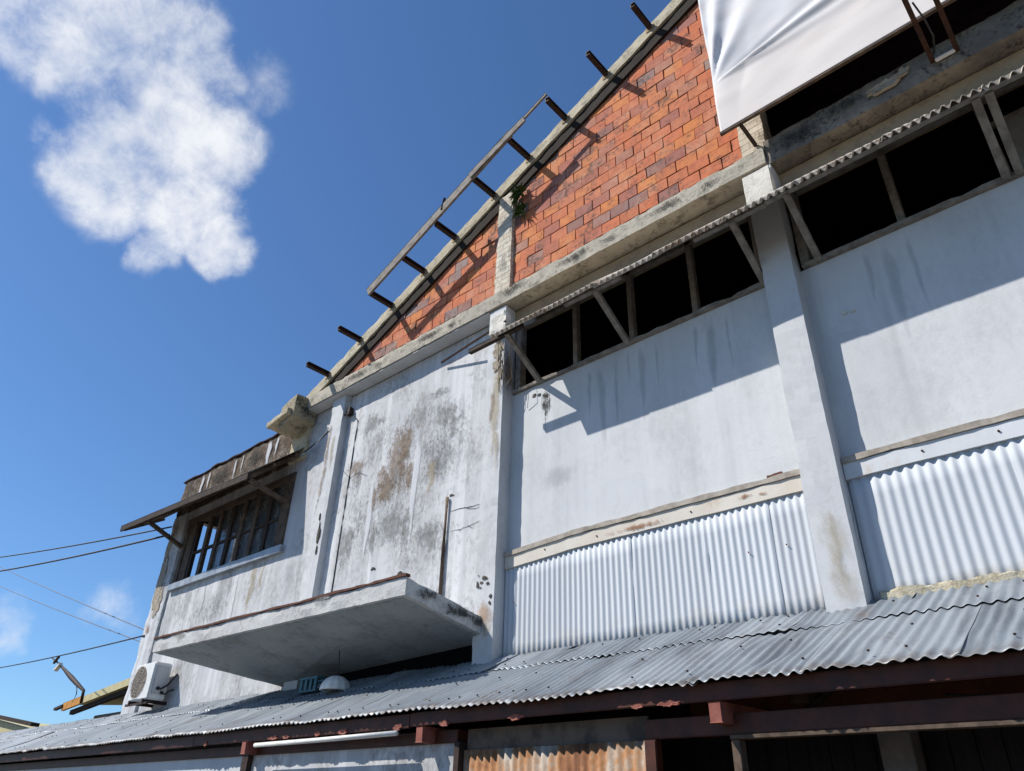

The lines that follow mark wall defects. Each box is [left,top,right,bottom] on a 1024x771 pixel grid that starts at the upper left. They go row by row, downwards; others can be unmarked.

spalling [866,66,910,97]
water stain [338,399,464,570]